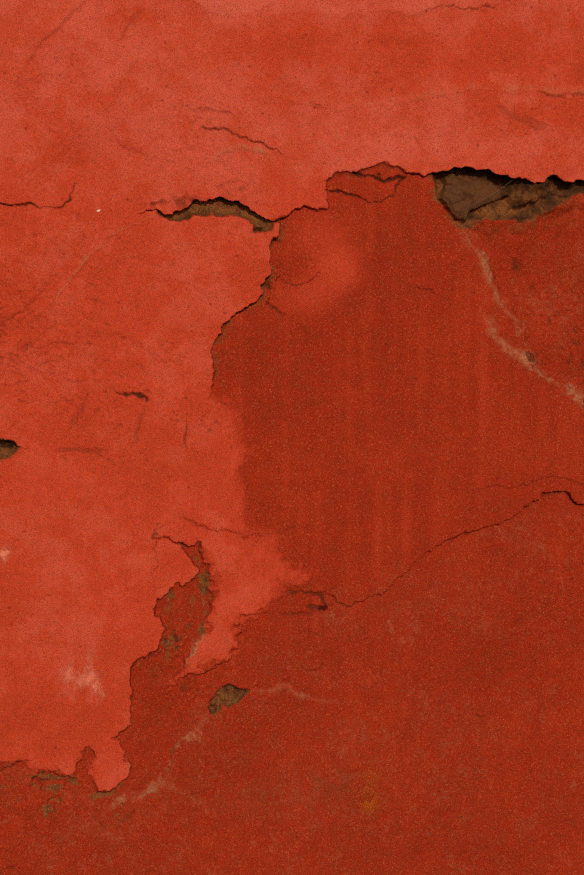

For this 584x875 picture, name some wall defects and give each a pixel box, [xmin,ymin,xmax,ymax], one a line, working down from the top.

crack [413,0,511,17]
crack [0,180,83,225]
peeling [0,166,584,819]
crack [258,475,584,617]